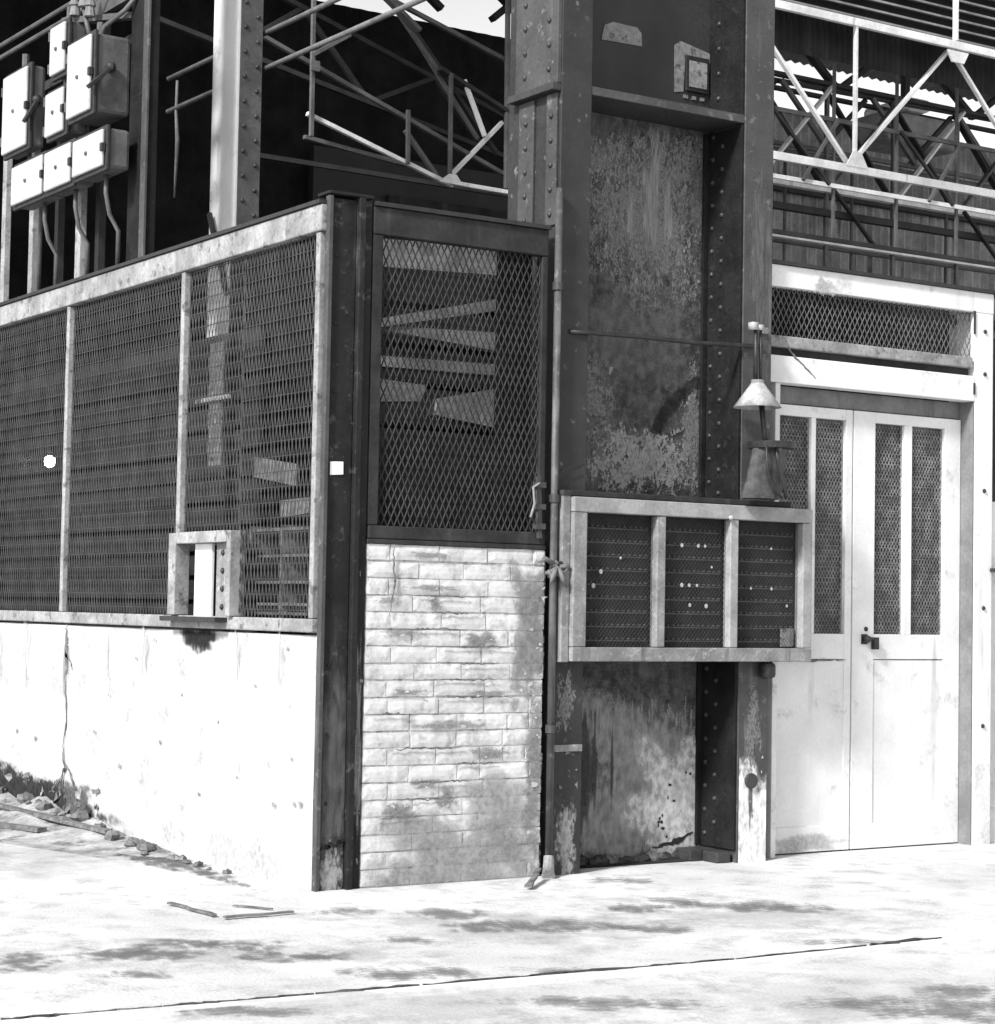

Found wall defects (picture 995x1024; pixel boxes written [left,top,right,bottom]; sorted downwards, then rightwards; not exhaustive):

water stain [182,628,217,652]
crack [49,628,74,809]
water stain [367,770,534,888]
rust [580,832,693,865]